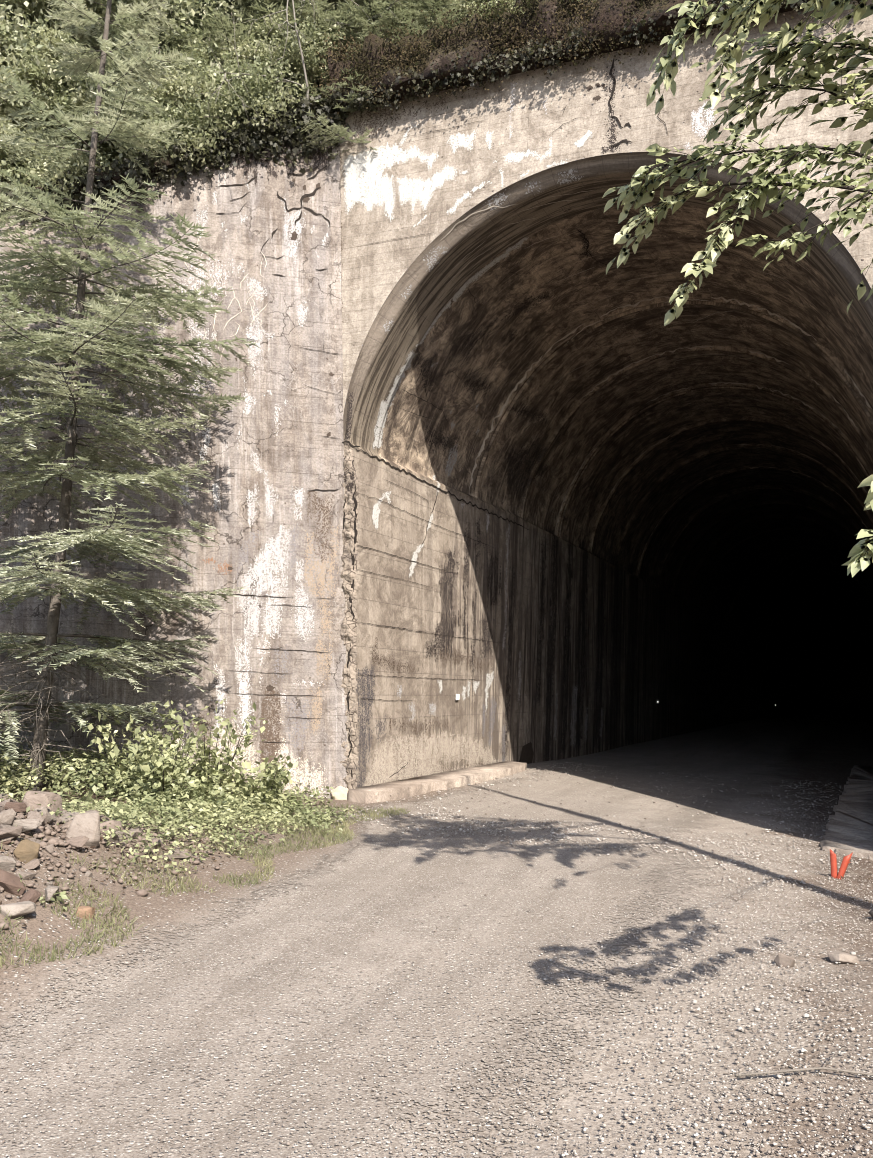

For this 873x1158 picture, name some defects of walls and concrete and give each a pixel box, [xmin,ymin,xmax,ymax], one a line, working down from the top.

crack [608,58,631,146]
crack [181,164,330,364]
spalling [340,445,359,790]
damp [372,491,391,529]
damp [356,512,522,788]
damp [535,446,683,761]